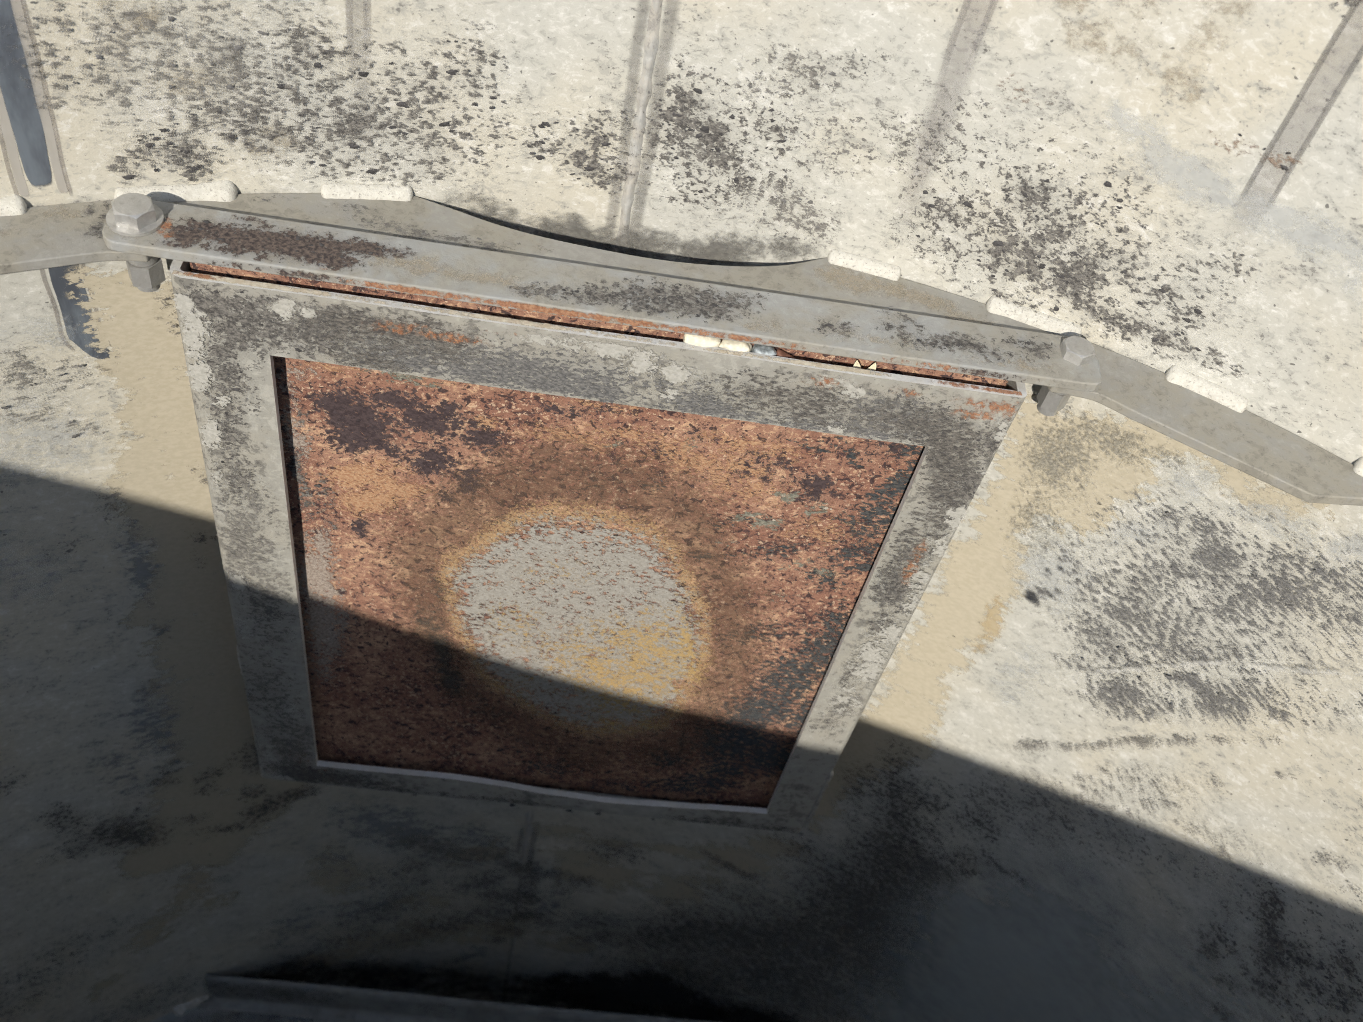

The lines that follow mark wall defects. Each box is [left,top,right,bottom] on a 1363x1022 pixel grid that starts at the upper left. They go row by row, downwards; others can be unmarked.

rust [340,280,804,349]
leakage [706,348,888,376]
rust [317,457,438,522]
rust [464,397,812,508]
rust [779,514,871,547]
leakage [65,267,650,954]
rust [437,499,713,740]
leakage [808,394,1346,835]
leakage [261,802,816,983]
leakage [869,885,1247,1022]